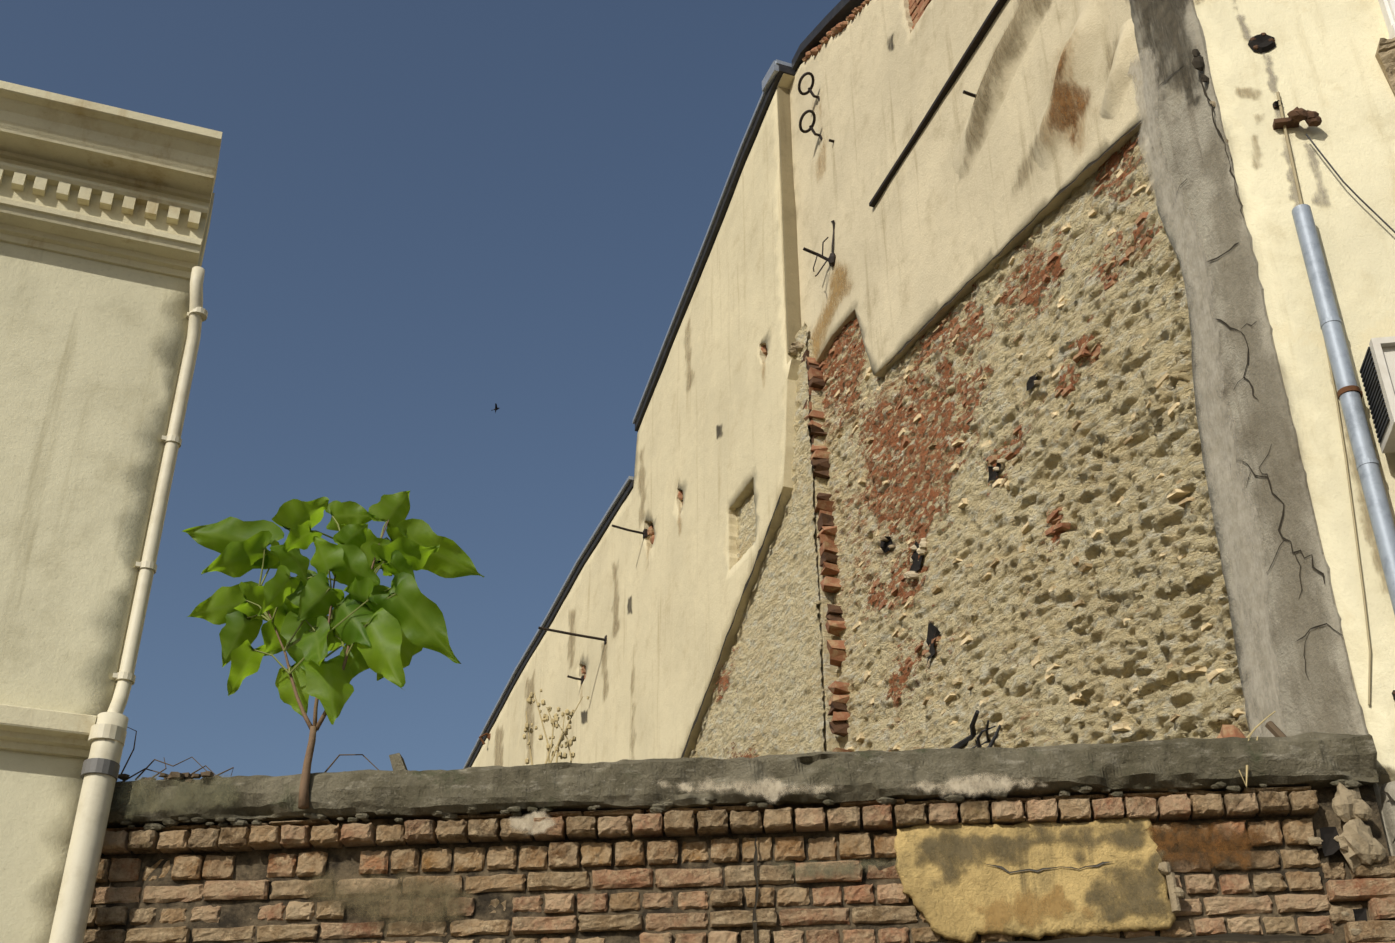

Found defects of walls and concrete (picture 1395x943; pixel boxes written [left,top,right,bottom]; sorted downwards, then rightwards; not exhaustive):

spalling [802,0,870,62]
leakage [966,0,1050,149]
rust [1049,54,1088,141]
leakage [1133,0,1199,105]
leakage [1263,53,1276,91]
leakage [1284,143,1327,206]
crack [1216,319,1258,400]
spalling [689,129,1250,759]